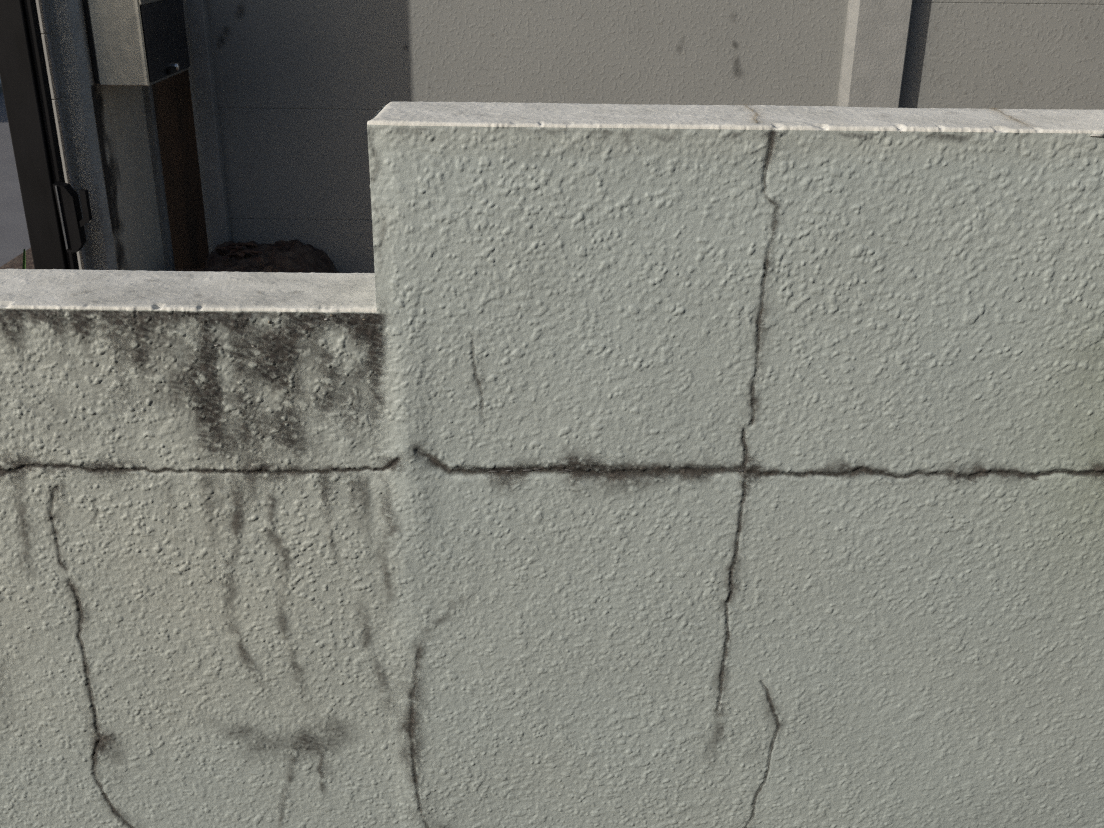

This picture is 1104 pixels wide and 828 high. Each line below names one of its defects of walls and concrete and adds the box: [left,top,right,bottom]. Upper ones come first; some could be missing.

crack [91,84,124,270]
crack [764,130,778,231]
water stain [0,309,382,456]
crack [755,304,764,348]
water stain [231,492,242,535]
crack [0,386,1104,828]